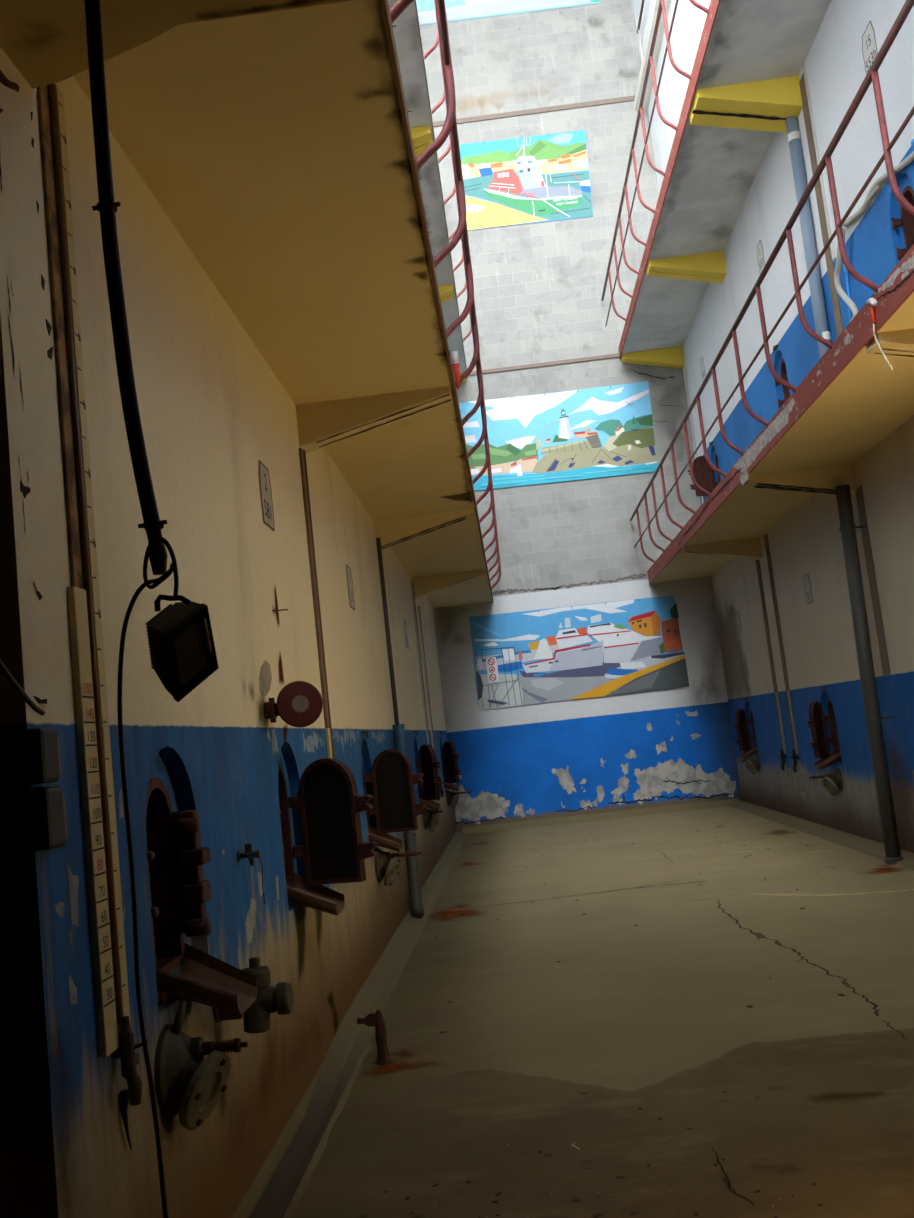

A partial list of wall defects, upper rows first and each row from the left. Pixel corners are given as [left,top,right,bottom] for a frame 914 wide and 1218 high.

peeling [454,775,535,825]
peeling [552,711,736,810]
crack [447,851,910,1041]
crack [712,1147,755,1206]